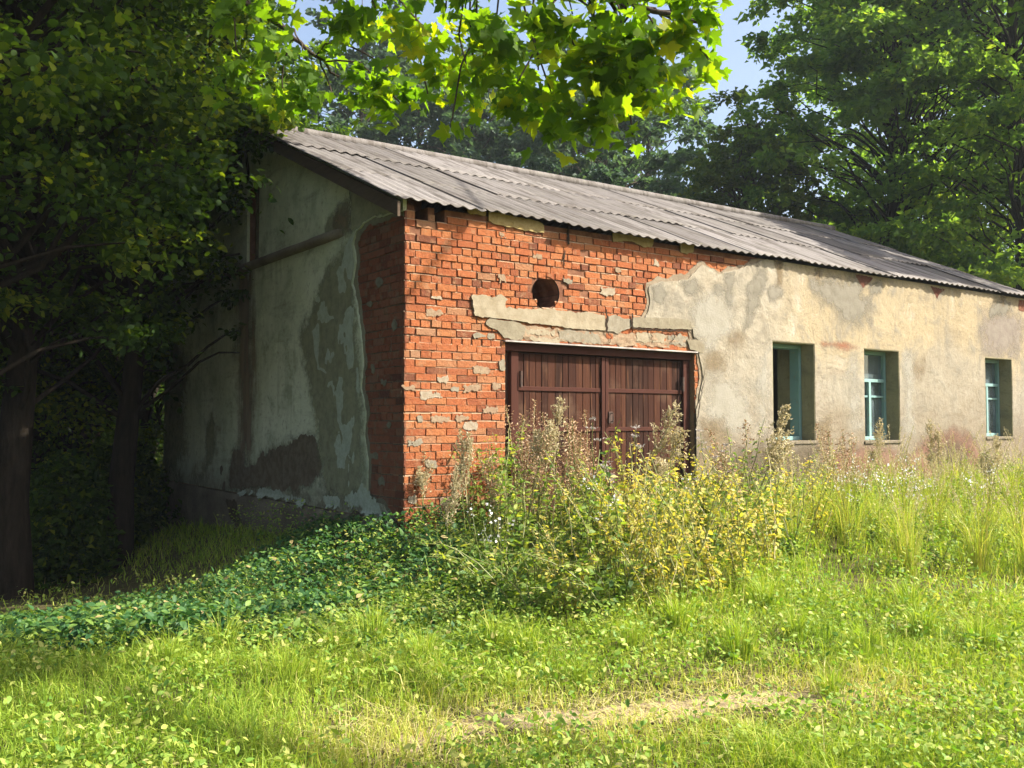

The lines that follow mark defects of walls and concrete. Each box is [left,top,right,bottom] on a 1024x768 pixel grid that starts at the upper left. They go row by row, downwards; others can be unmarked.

spalling [220,209,748,538]